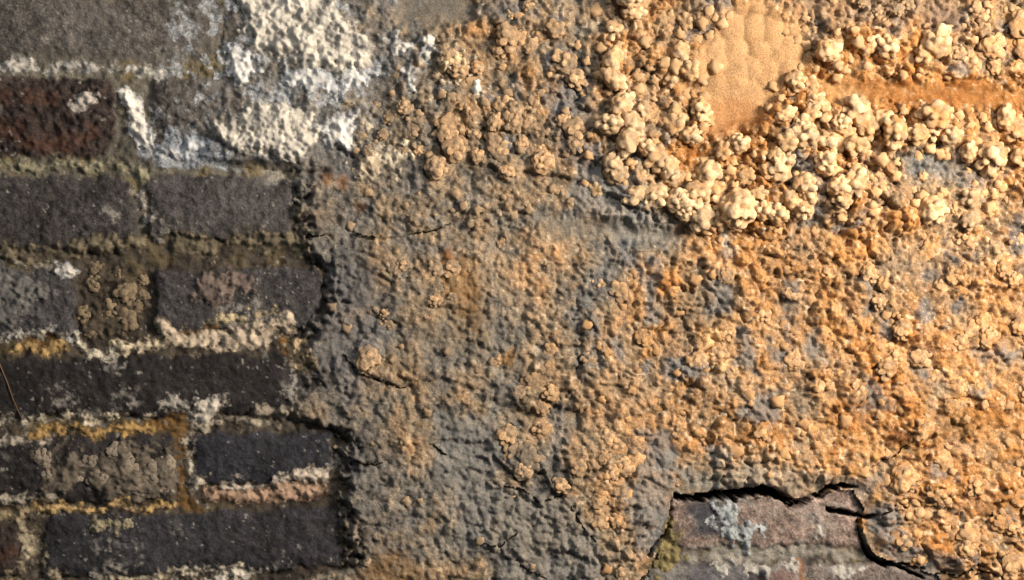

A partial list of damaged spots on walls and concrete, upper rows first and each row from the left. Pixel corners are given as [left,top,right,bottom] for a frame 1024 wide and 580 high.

leakage [165,2,200,54]
leakage [198,0,222,36]
leakage [391,26,414,56]
leakage [68,91,99,114]
leakage [242,82,265,97]
leakage [400,66,420,94]
leakage [117,85,224,169]
leakage [212,101,358,165]
leakage [356,114,374,132]
leakage [352,141,407,184]
leakage [399,139,418,160]
crack [673,483,994,578]